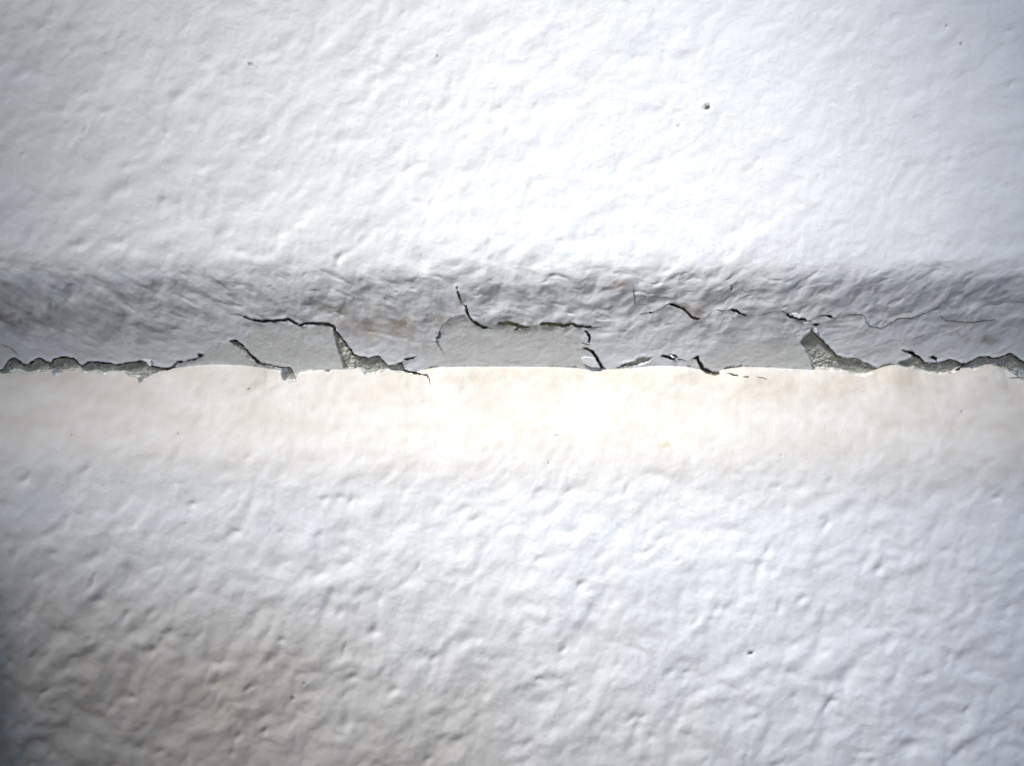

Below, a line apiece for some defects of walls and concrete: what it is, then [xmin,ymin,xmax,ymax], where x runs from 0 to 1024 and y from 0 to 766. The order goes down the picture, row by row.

spalling [0,358,175,381]
spalling [283,368,296,382]
spalling [334,330,409,375]
crack [229,287,632,382]
crack [633,289,1024,380]
spalling [801,332,876,375]
spalling [899,355,1024,381]